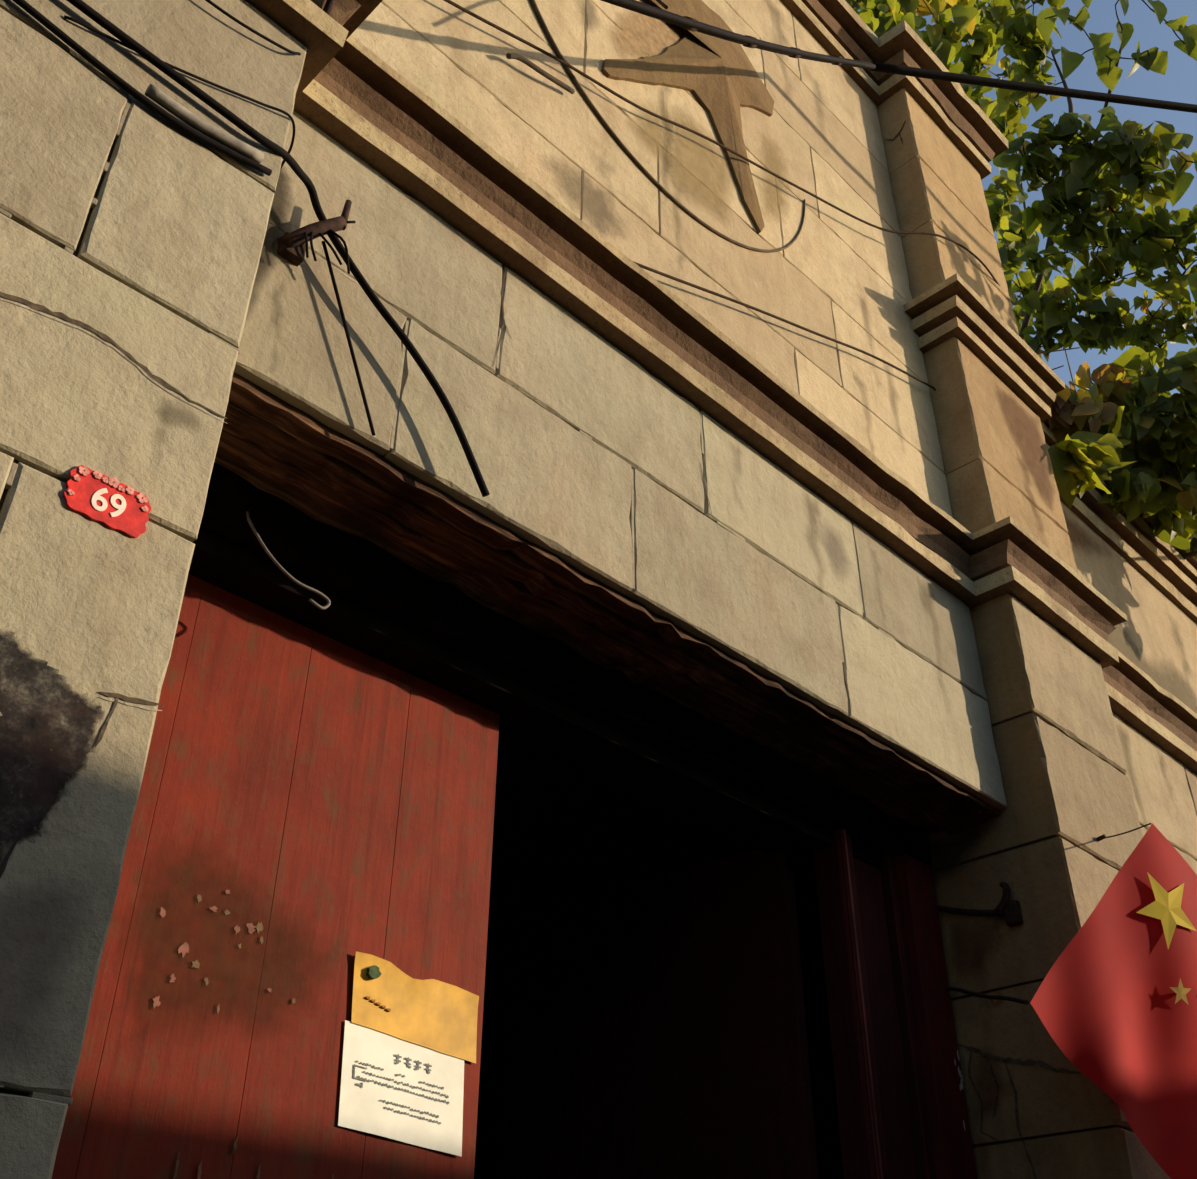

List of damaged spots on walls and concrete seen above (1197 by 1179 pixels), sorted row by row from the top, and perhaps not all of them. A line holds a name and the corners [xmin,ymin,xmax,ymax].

crack [0,292,227,423]
crack [0,827,23,882]
crack [958,1044,1080,1179]